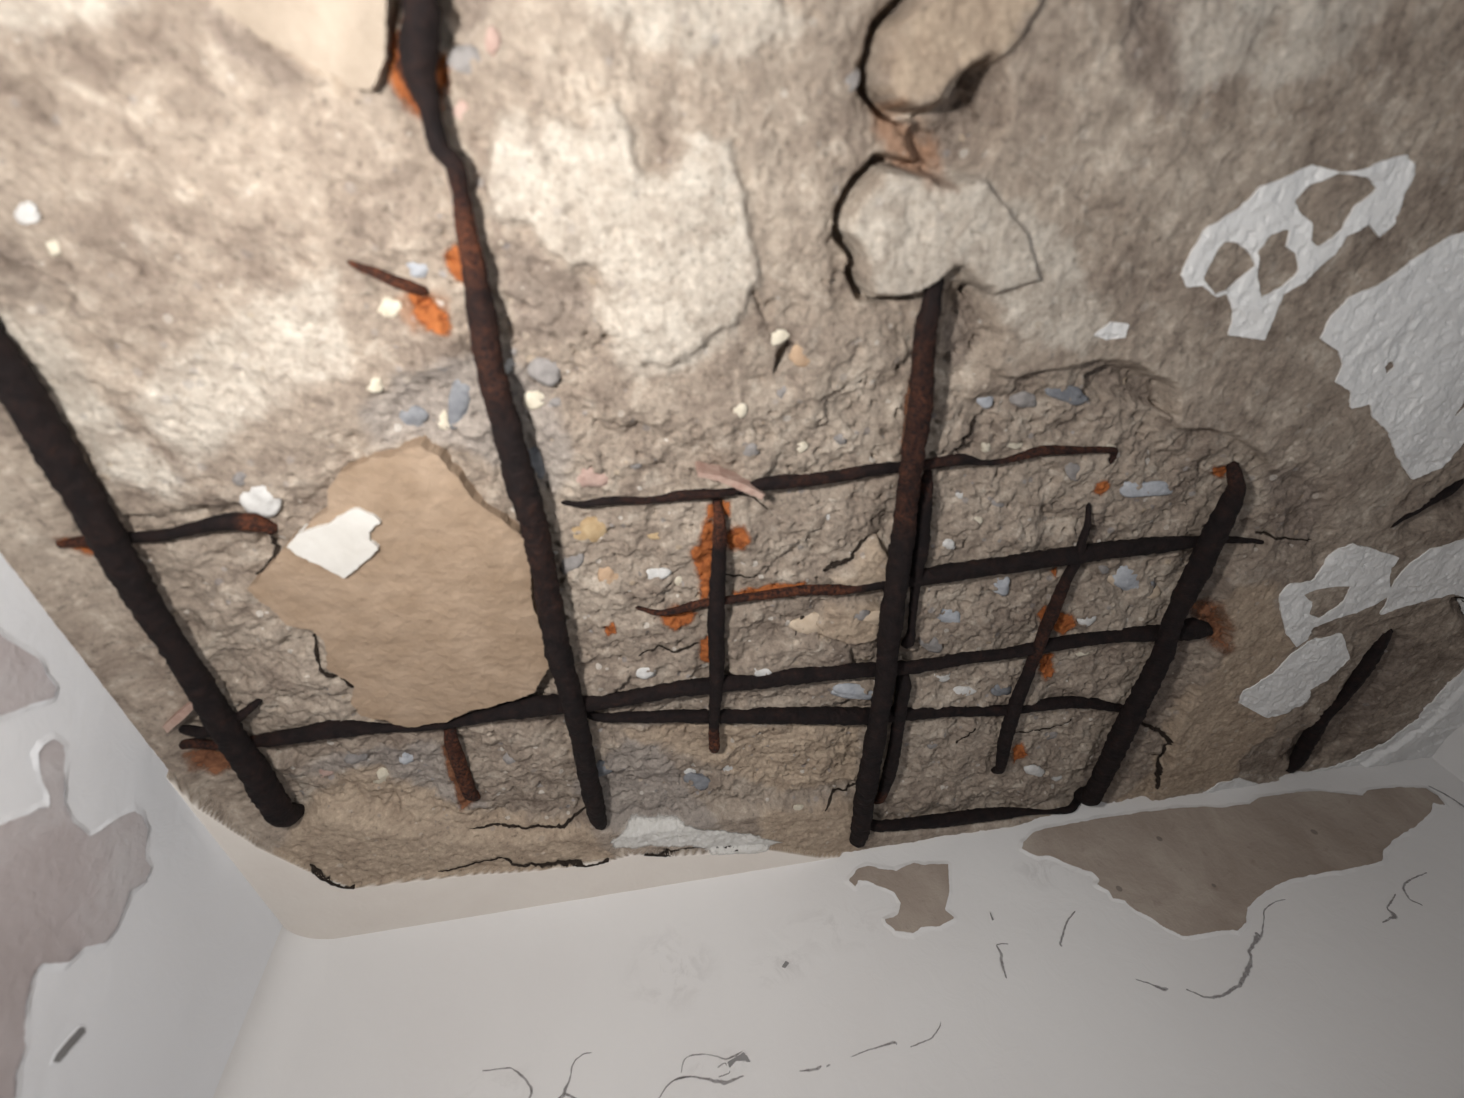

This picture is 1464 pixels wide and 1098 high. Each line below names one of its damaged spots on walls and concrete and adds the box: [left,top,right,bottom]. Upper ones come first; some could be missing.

rust [444,244,463,283]
peeling [1180,155,1415,340]
rust [408,293,451,335]
peeling [1320,232,1464,534]
spalling [0,0,1284,888]
rust [661,500,751,631]
rust [184,749,231,775]
crack [438,806,609,872]
crack [644,846,738,857]
peeling [1017,784,1450,941]
crack [1136,899,1286,998]
crack [660,1051,743,1097]